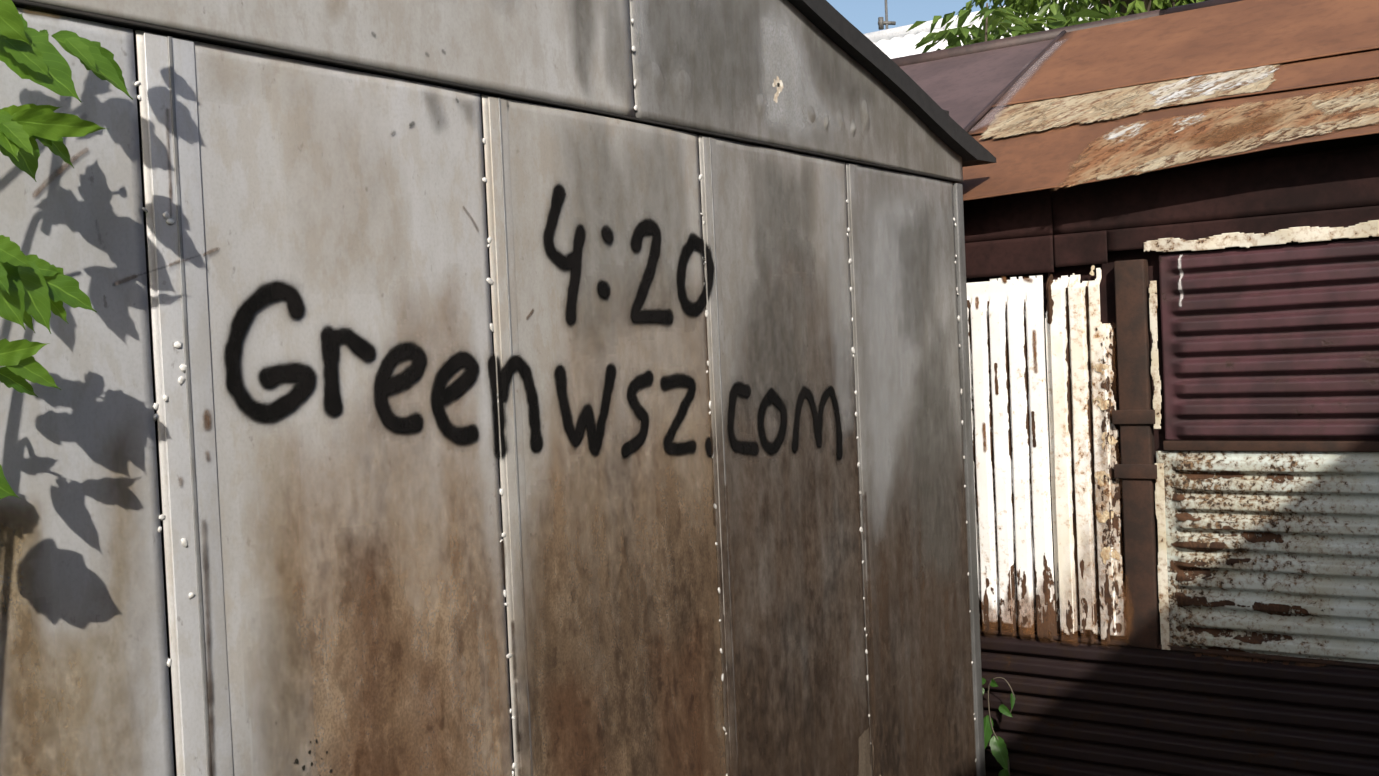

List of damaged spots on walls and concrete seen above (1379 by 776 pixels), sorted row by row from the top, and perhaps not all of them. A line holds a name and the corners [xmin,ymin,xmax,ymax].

peeling [979,63,1379,187]
corrosion [0,515,128,776]
corrosion [280,274,1134,776]
peeling [1091,324,1125,633]
peeling [1170,454,1325,617]
peeling [1176,625,1327,667]